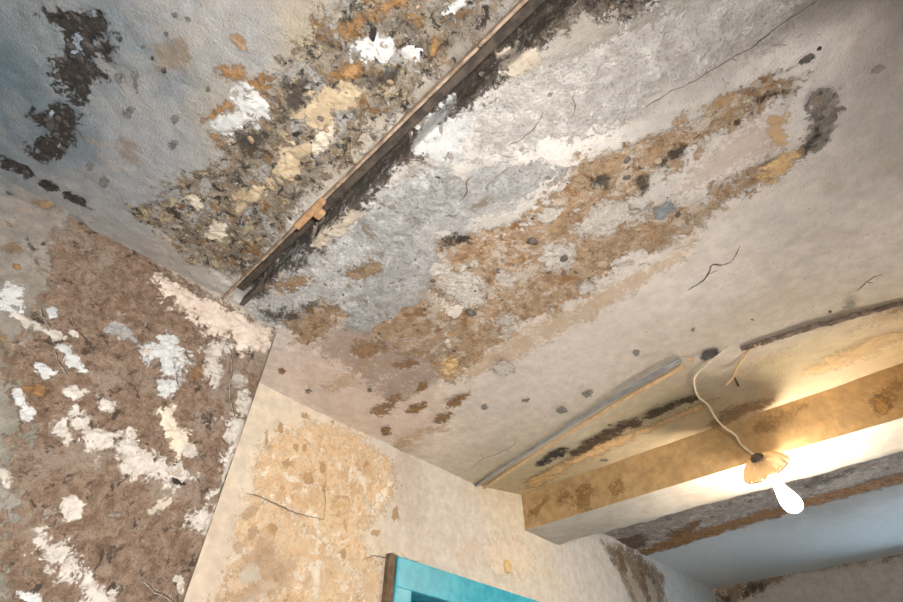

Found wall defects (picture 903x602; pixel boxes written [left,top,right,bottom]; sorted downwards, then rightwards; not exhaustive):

spalling [122,0,512,287]
spalling [784,84,846,175]
leakage [0,242,37,270]
spalling [231,345,269,419]
leakage [523,399,776,516]
spalling [601,451,903,556]
spalling [216,548,285,602]